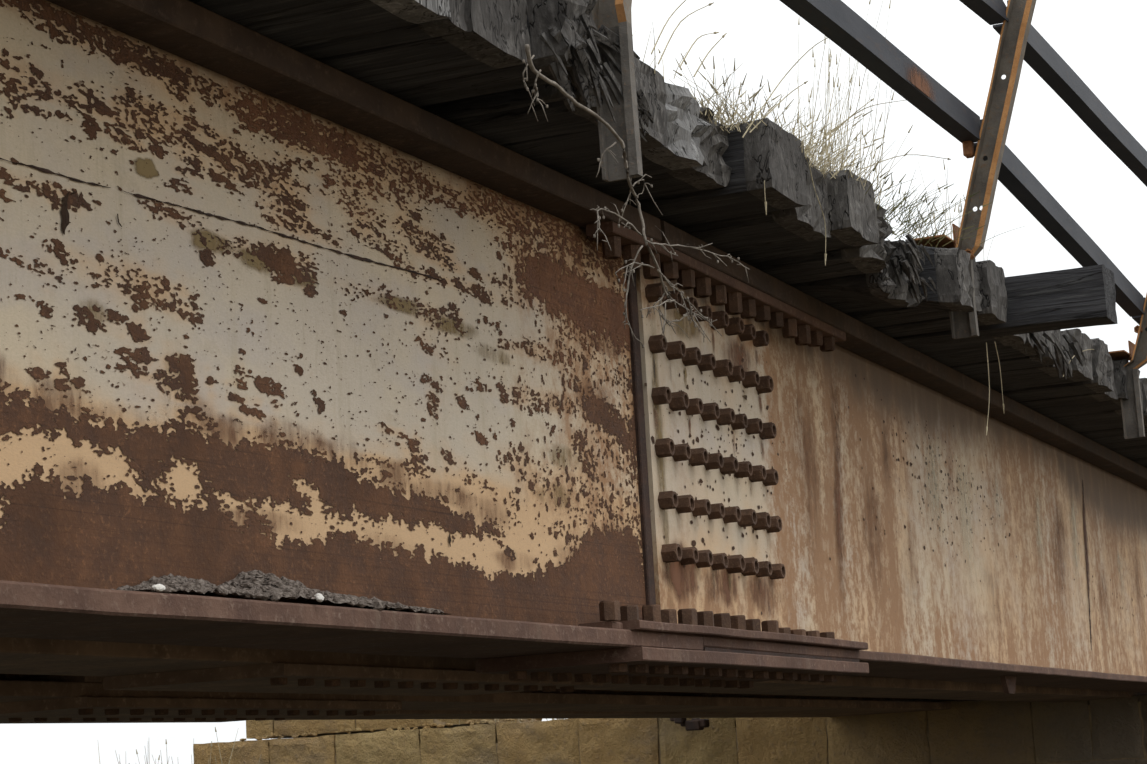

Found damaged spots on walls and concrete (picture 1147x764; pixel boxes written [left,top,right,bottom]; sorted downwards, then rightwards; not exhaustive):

peeling [135,158,159,178]
crack [0,158,440,280]
rust [0,0,787,626]